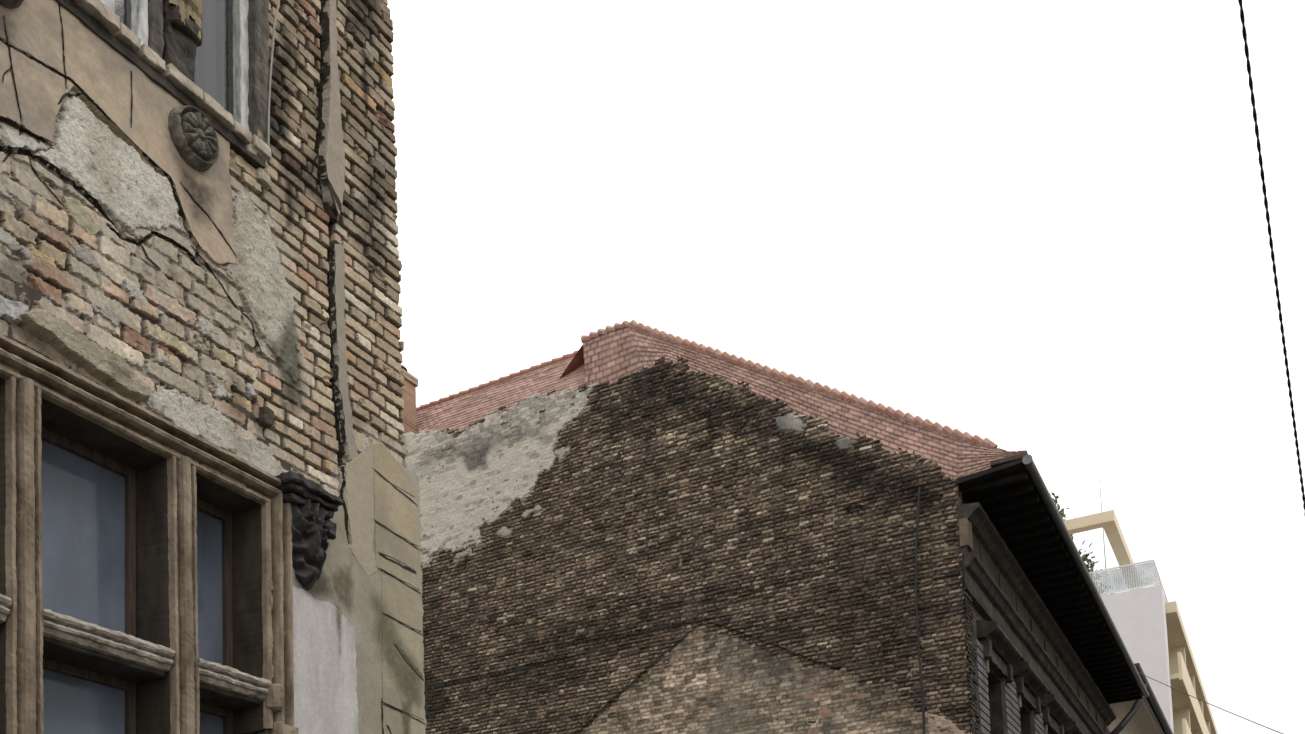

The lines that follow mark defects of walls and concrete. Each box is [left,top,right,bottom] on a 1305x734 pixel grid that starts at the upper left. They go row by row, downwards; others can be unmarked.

peeling [0,0,236,271]
peeling [90,303,121,328]
peeling [206,375,258,400]